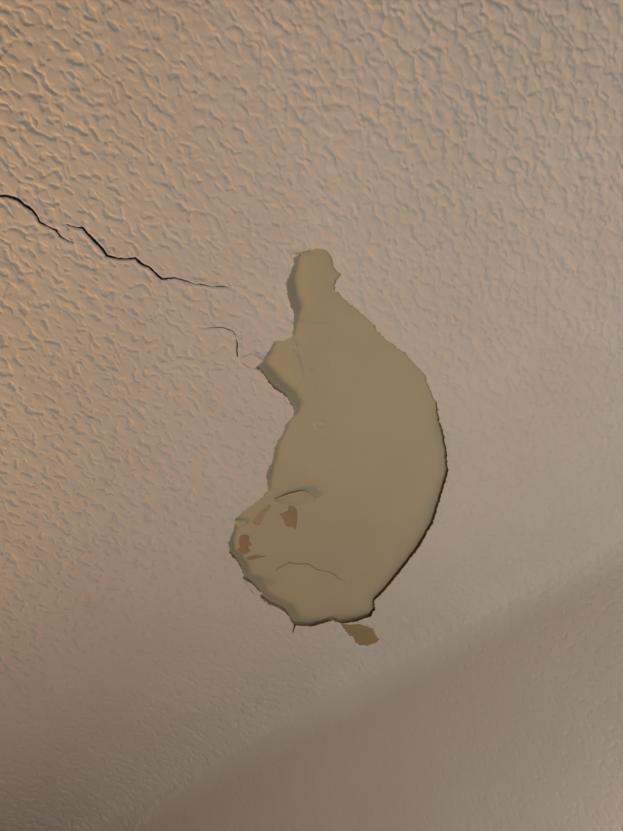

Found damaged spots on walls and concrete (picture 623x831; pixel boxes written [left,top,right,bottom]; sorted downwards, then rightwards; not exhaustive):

crack [0,194,235,290]
peeling [228,248,448,646]